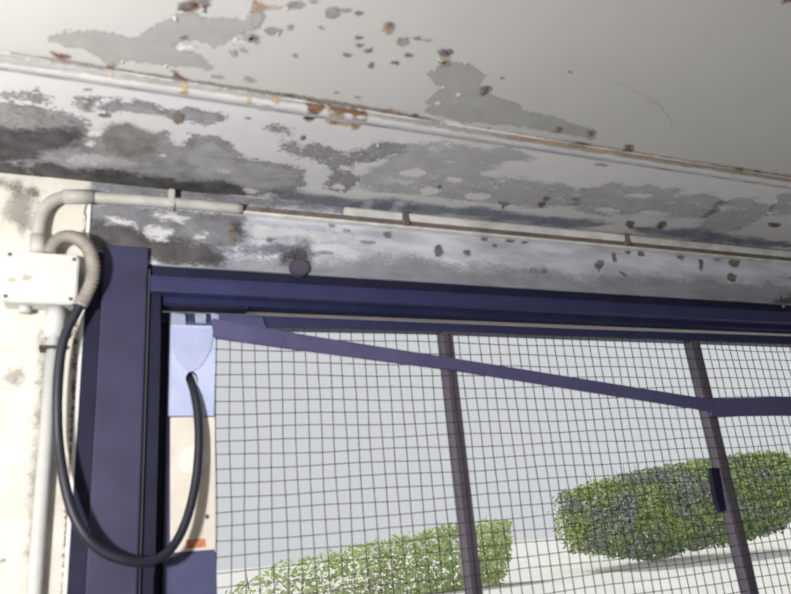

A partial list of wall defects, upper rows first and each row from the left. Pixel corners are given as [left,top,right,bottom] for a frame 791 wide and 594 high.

peeling [48,0,318,79]
peeling [323,7,363,19]
peeling [382,22,431,65]
water stain [172,112,184,125]
rust [0,51,791,182]
peeling [411,49,597,140]
water stain [0,126,605,229]
peeling [0,87,791,231]
water stain [87,204,315,268]
water stain [633,227,791,247]